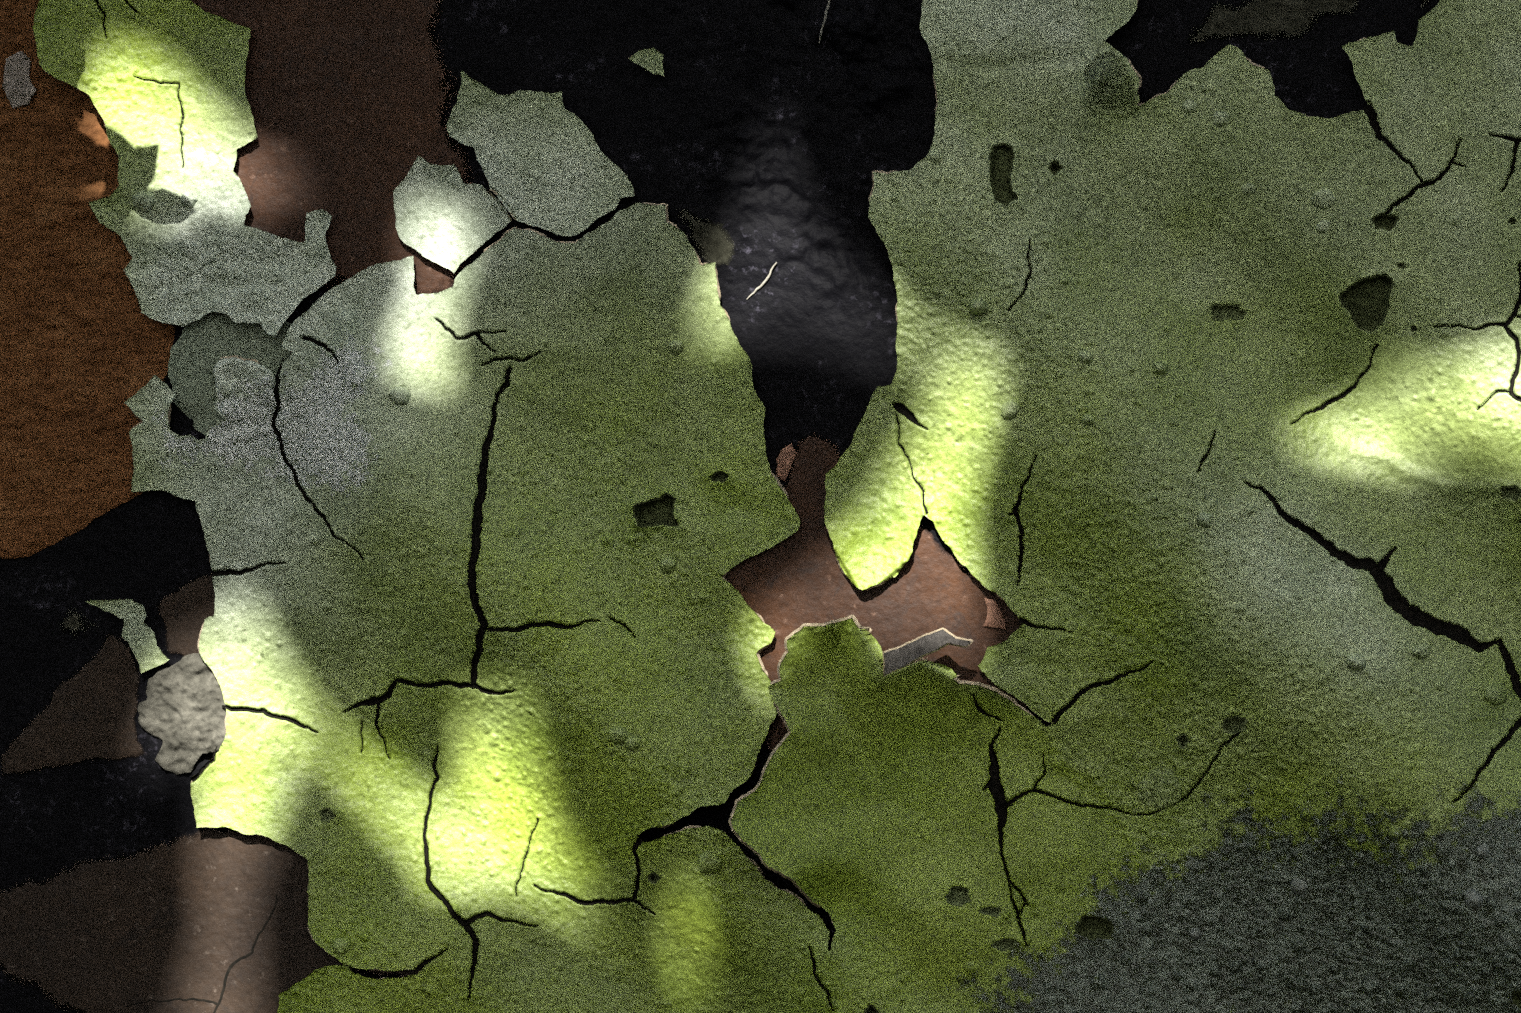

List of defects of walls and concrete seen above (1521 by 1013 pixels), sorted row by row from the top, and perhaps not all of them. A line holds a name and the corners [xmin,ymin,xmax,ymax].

spalling [0,0,336,559]
peeling [191,0,512,294]
crack [1363,104,1521,215]
crack [1435,262,1521,409]
peeling [1,599,169,775]
peeling [0,827,344,1013]
spalling [138,653,227,775]
crack [211,318,635,759]
crack [416,746,655,1000]
peeling [724,434,1028,708]
crack [973,662,1241,946]
crack [1245,482,1521,802]